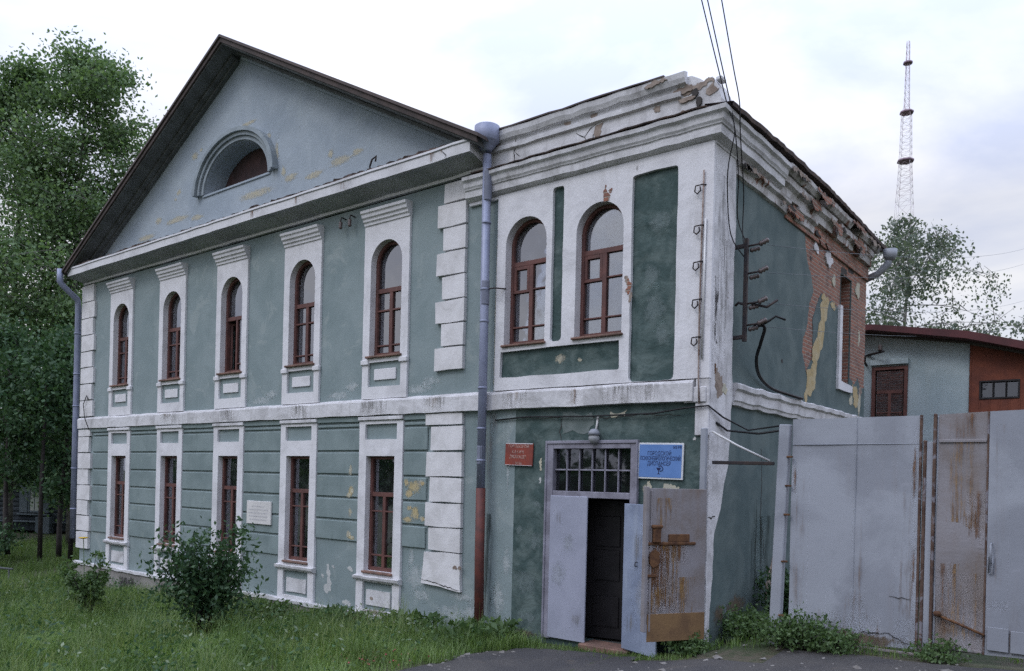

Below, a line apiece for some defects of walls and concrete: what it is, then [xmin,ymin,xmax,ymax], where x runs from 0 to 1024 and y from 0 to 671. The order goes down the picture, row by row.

spalling [673,75,725,107]
flaking render [783,166,883,416]
peeling [404,480,425,522]
peeling [321,564,353,593]
corrosion [651,541,686,614]